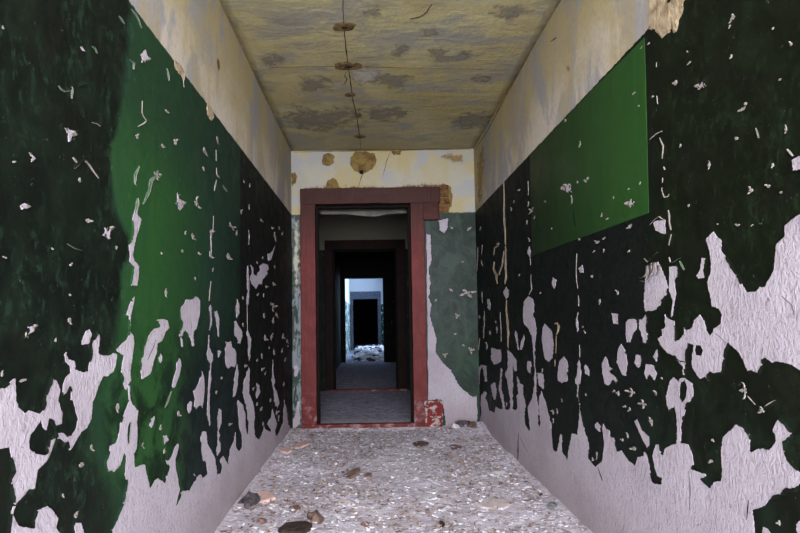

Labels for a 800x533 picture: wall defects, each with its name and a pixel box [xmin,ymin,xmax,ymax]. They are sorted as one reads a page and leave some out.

flaking render [648,0,685,38]
peeling [58,81,87,99]
flaking render [166,60,185,85]
water stain [349,69,407,87]
crack [242,11,557,174]
peeling [72,156,99,178]
flaking render [350,151,377,175]
peeling [649,131,669,198]
peeling [786,149,800,173]
peeling [0,170,301,533]
peeling [425,177,800,533]